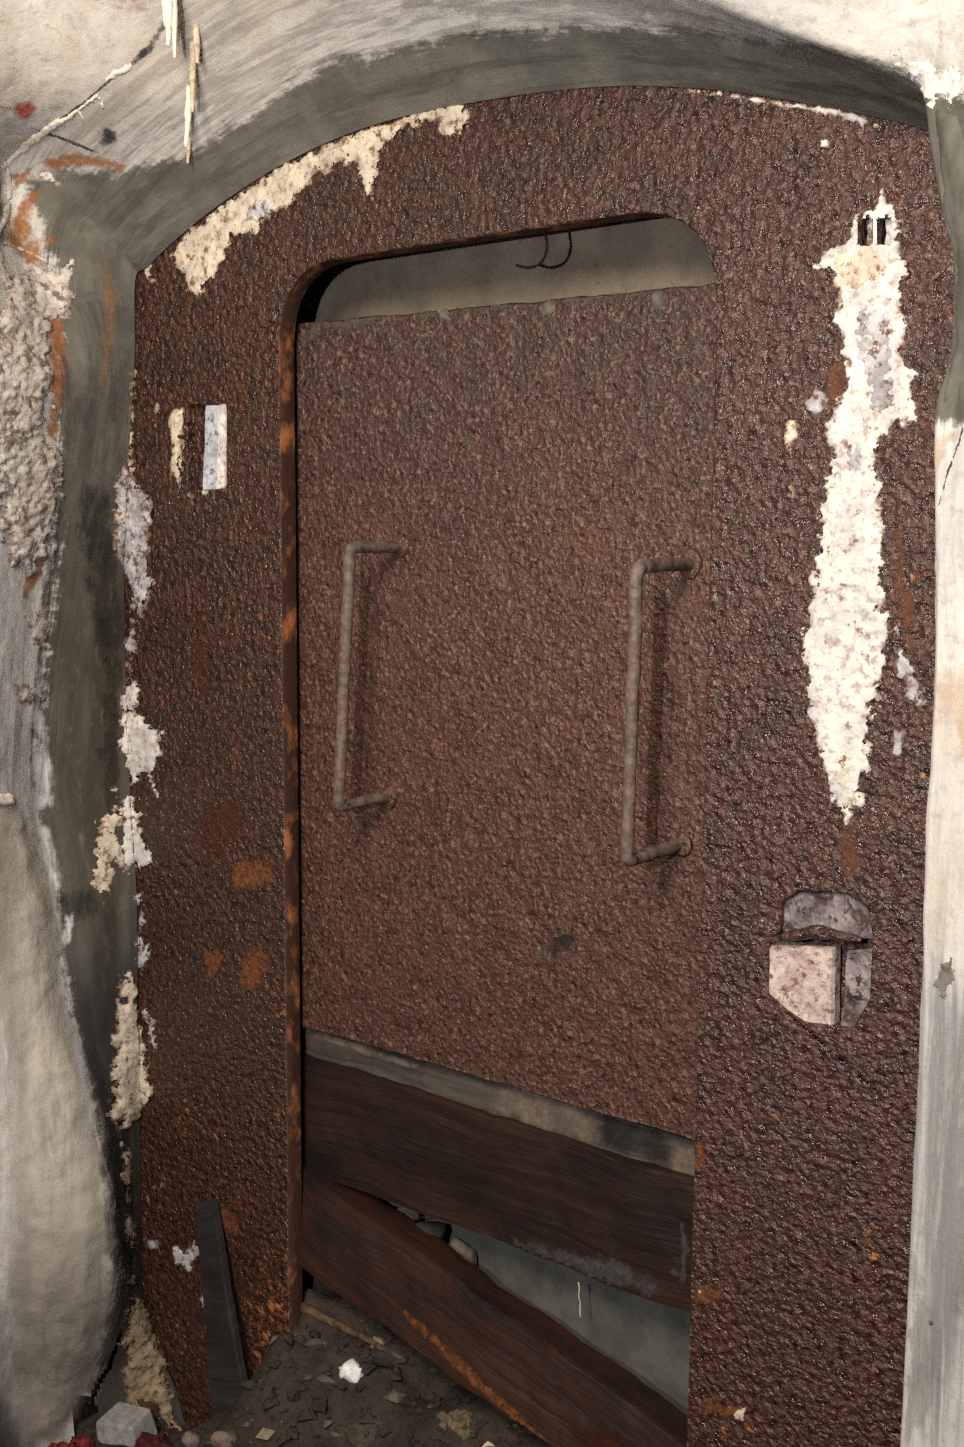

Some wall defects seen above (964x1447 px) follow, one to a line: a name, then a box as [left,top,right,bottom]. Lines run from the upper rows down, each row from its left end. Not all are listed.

efflorescence [161,0,202,164]
water stain [29,367,165,973]
corrosion [232,858,274,890]
water stain [64,1013,92,1134]
water stain [95,893,158,1267]
corrosion [700,1398,746,1421]